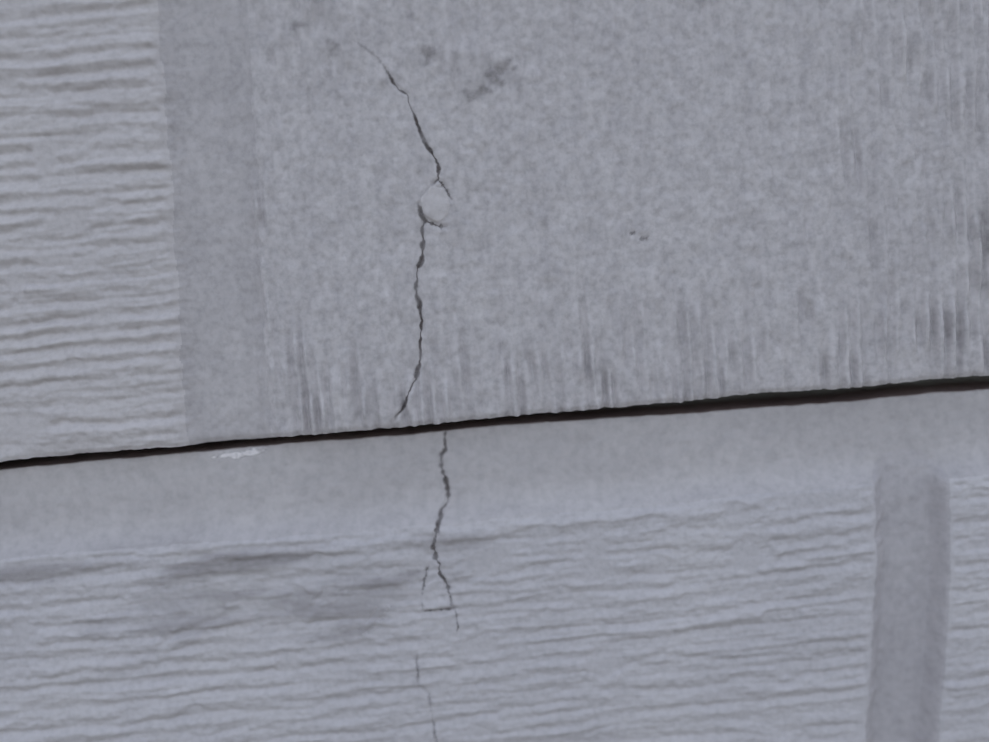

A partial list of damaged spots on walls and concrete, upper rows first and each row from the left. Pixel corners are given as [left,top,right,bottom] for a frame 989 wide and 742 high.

crack [390,77,450,271]
crack [398,296,423,414]
crack [420,433,459,627]